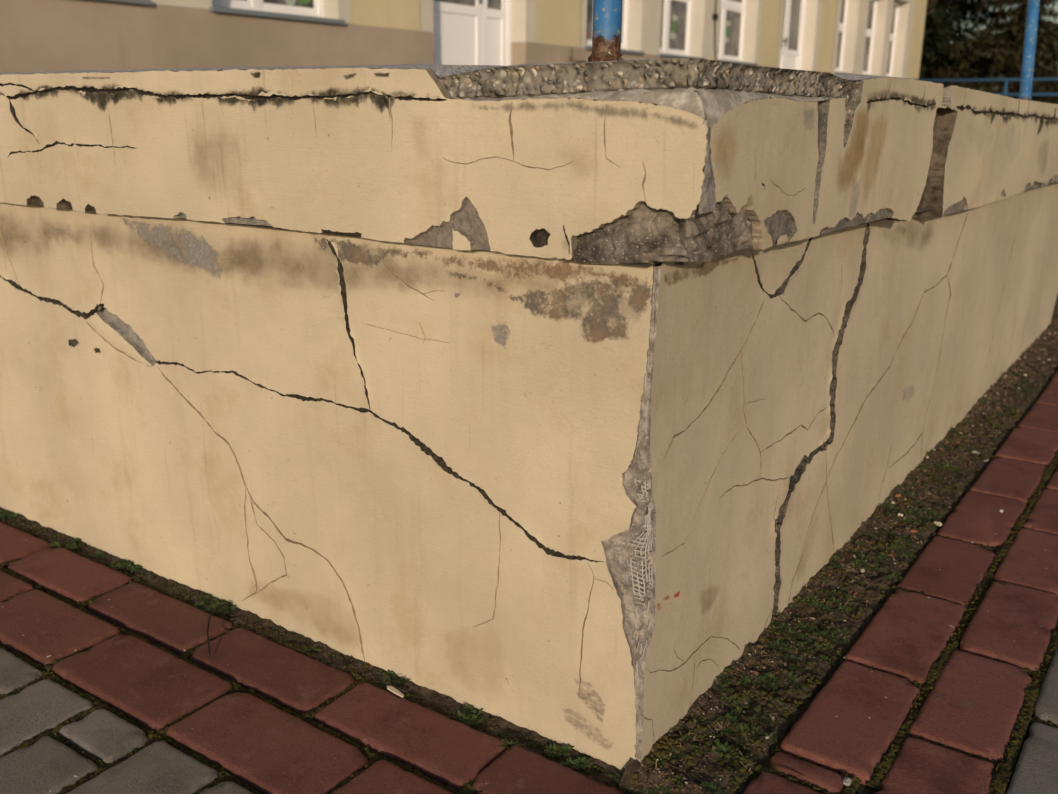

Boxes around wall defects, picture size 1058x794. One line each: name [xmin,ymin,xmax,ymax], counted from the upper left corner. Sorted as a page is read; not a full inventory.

crack [0,83,447,166]
spalling [427,58,864,148]
crack [866,80,1058,135]
flaking render [820,208,894,234]
crack [0,229,104,320]
crack [1050,294,1058,317]
crack [662,99,968,629]
crack [156,240,614,692]
spalling [404,197,797,763]